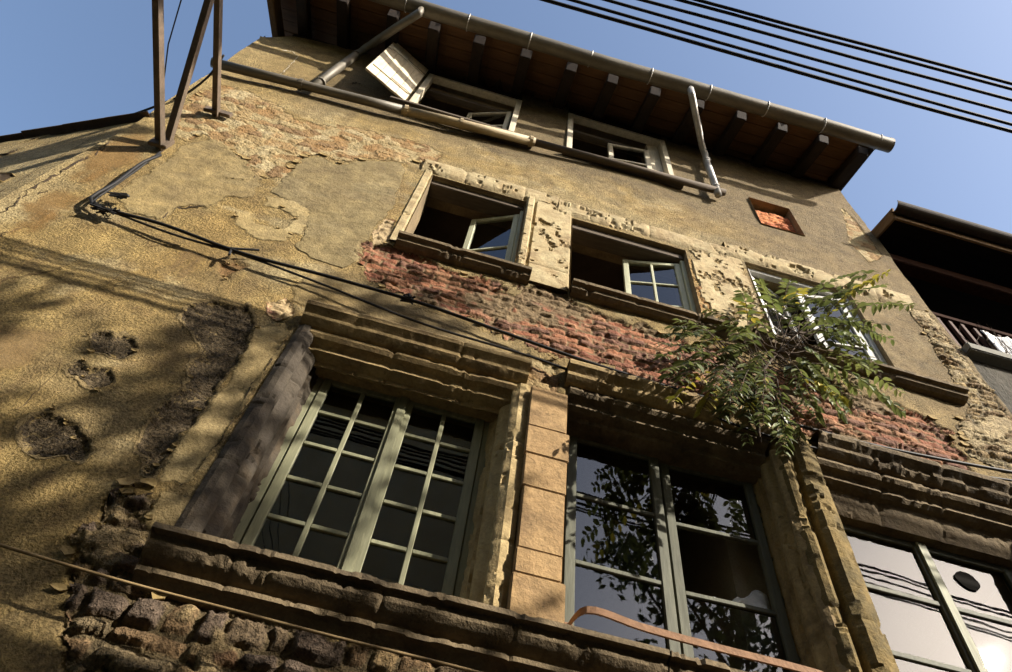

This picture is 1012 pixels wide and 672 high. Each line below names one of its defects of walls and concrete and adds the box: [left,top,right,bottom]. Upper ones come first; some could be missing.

flaking render [169,85,442,179]
crack [0,128,121,237]
flaking render [13,405,96,465]
flaking render [62,329,142,392]
flaking render [132,298,295,478]
flaking render [353,219,969,470]
flaking render [145,491,192,531]